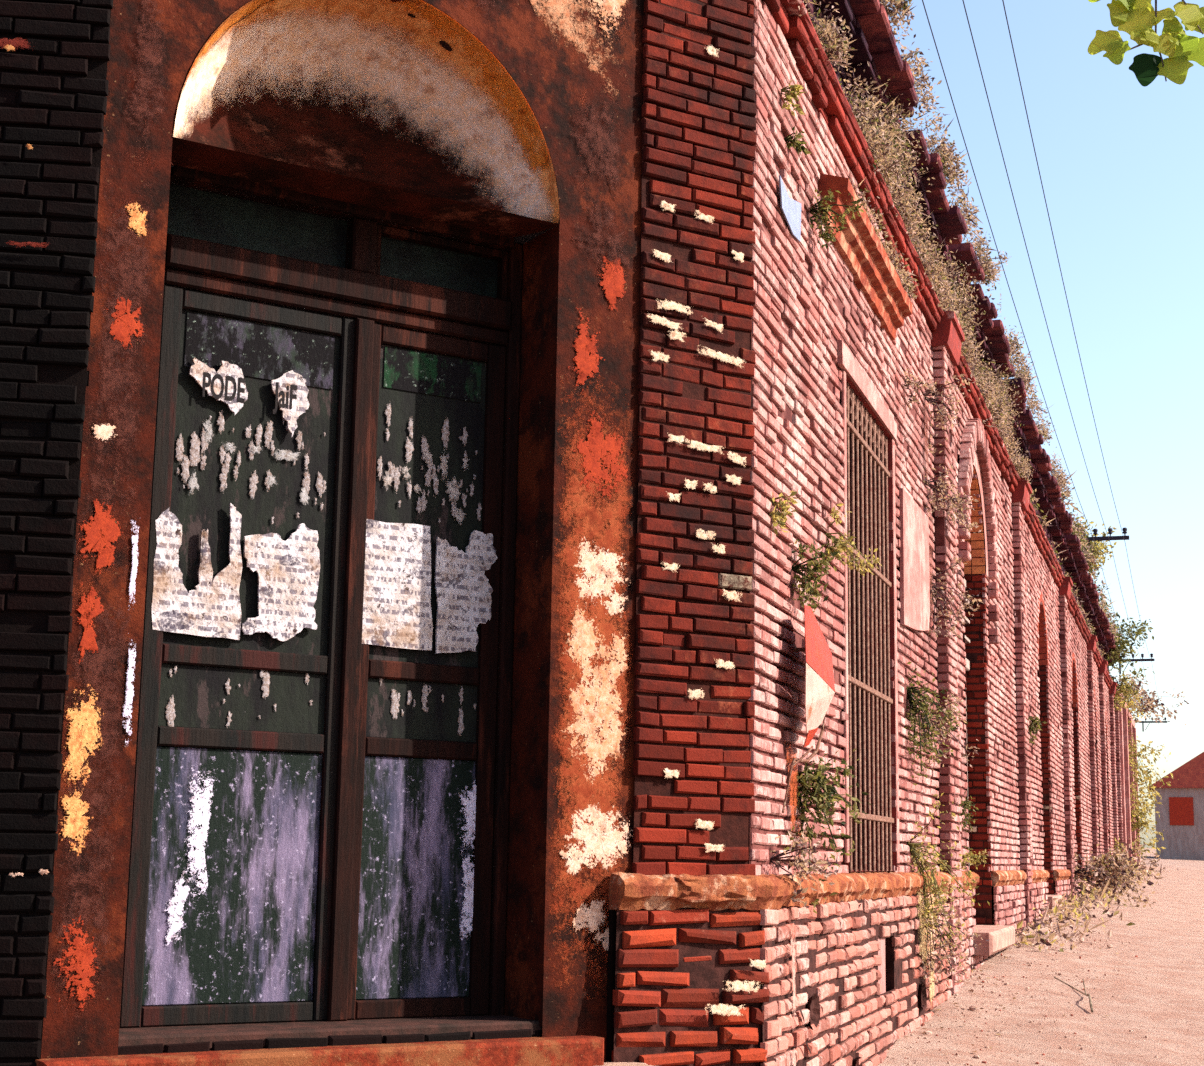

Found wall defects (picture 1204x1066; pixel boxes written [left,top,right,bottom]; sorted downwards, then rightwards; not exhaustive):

flaking render [125,202,147,236]
flaking render [106,297,144,349]
flaking render [598,256,626,311]
flaking render [78,499,139,603]
flaking render [76,584,104,664]
peeling [122,633,136,745]
flaking render [550,309,633,998]
flaking render [59,684,104,855]
flaking render [53,915,100,1011]